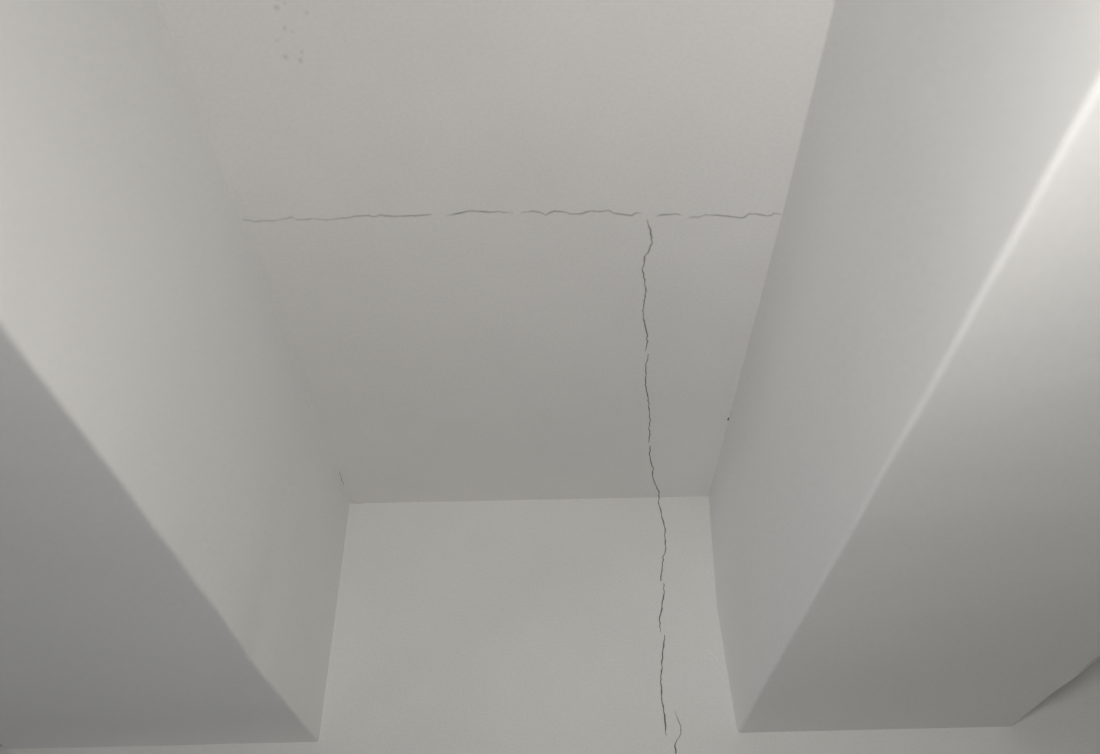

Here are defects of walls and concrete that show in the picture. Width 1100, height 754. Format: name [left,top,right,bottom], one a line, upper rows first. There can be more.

crack [242,209,781,754]